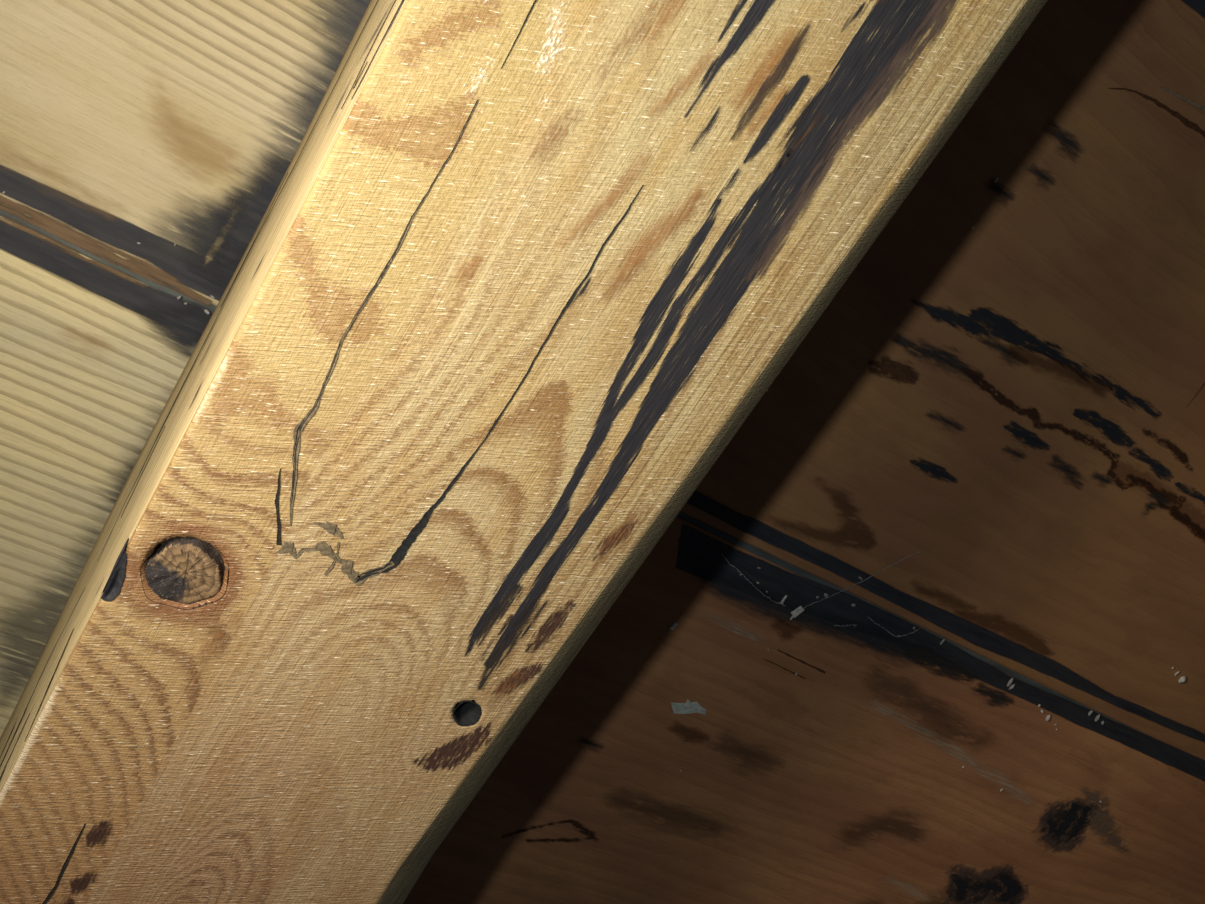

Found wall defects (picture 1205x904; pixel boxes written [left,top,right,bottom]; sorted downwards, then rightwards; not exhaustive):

damp [0,0,371,356]
crack [501,0,536,68]
crack [1108,88,1205,138]
crack [275,100,643,586]
damp [464,0,956,704]
damp [869,300,1205,541]
damp [413,723,491,771]
damp [676,491,1205,782]